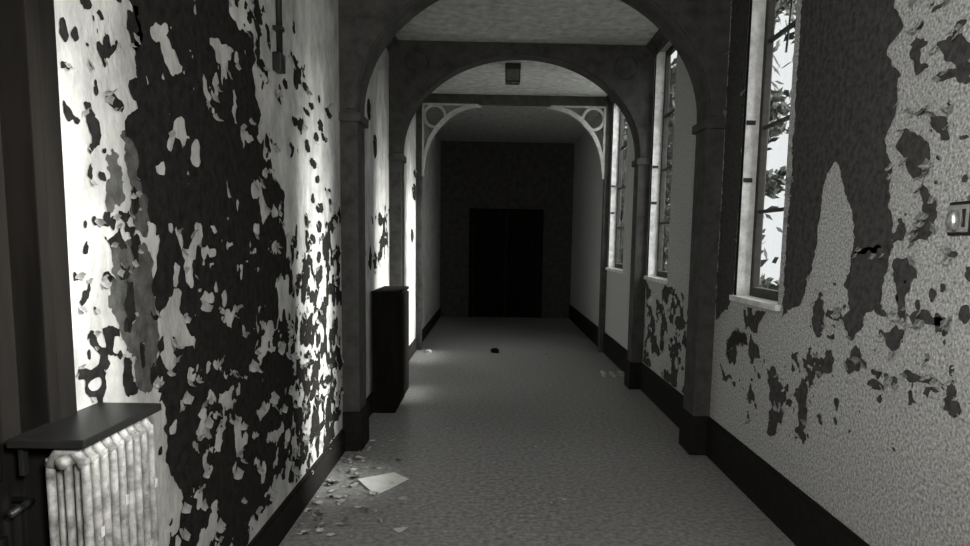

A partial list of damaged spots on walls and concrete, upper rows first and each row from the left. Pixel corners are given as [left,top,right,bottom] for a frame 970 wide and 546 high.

peeling [368,207,389,274]
peeling [714,0,750,321]
peeling [720,0,970,444]